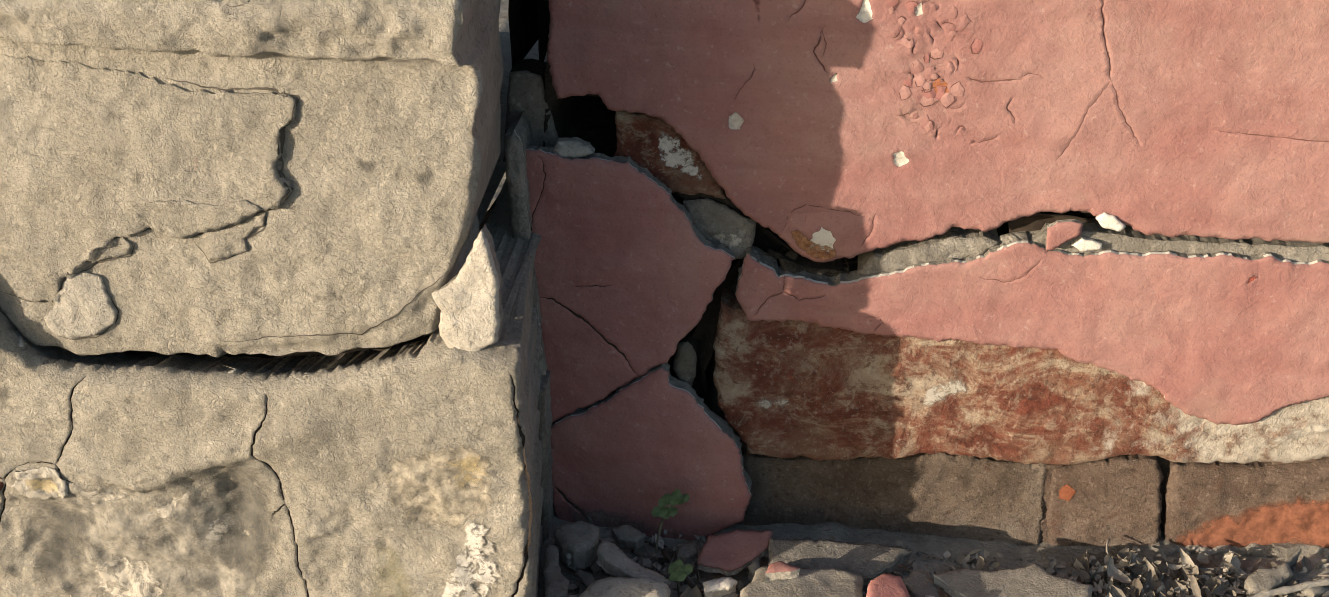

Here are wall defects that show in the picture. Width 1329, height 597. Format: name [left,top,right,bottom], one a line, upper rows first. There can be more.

crack [790,0,827,72]
crack [968,73,1041,144]
crack [1059,1,1139,157]
crack [1220,131,1329,142]
crack [531,157,546,231]
crack [997,213,1126,237]
crack [542,285,636,374]
crack [692,204,875,402]
crack [980,263,1039,283]
crack [0,376,86,521]
crack [251,395,309,597]